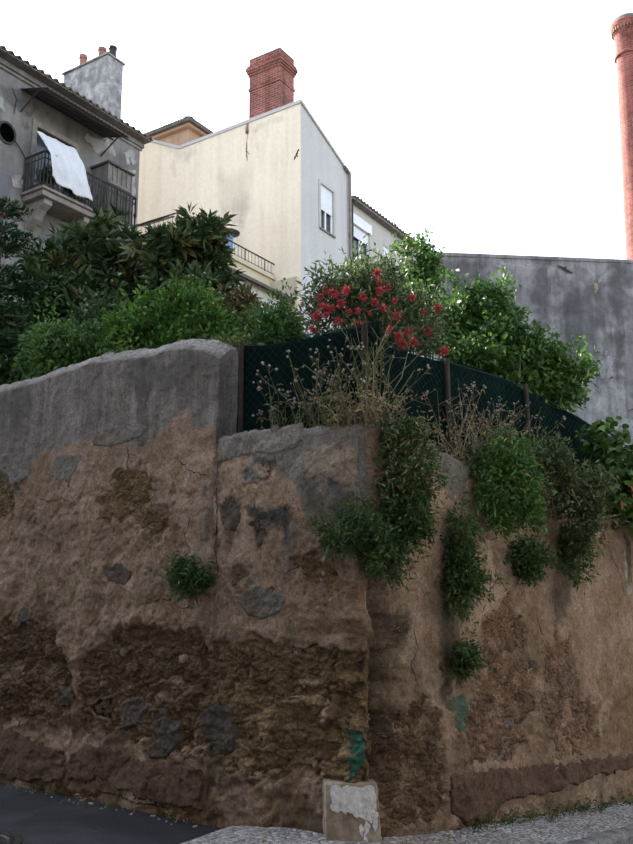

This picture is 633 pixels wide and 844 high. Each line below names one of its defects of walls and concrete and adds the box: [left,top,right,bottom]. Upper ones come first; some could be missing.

flaking render [84,133,139,230]
flaking render [0,471,18,520]
flaking render [99,469,176,539]
flaking render [0,591,633,829]